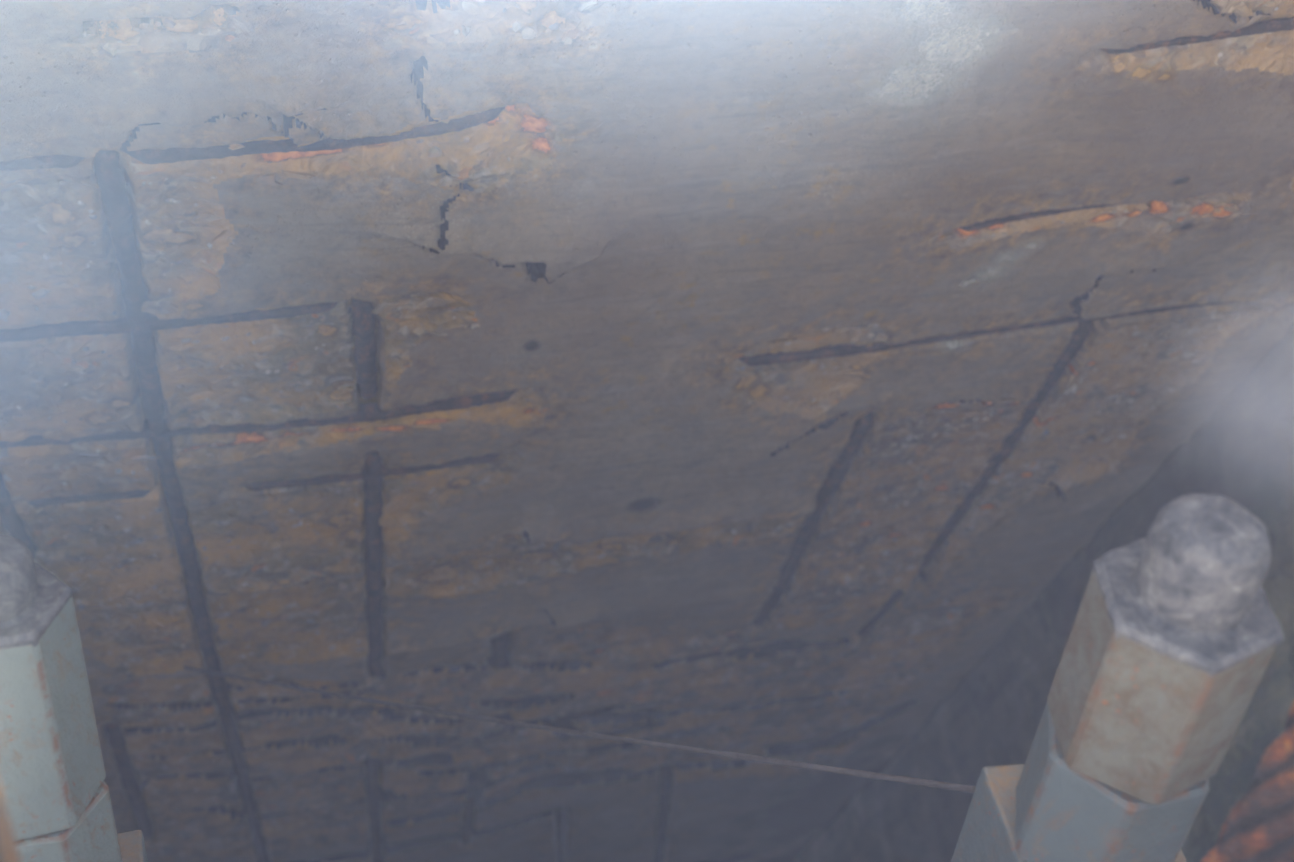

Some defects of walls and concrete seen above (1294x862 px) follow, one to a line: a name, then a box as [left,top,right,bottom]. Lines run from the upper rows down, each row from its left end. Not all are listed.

spalling [1107,0,1294,76]
crack [410,56,438,122]
rust [258,148,344,162]
spalling [130,103,567,194]
crack [419,165,474,254]
spalling [927,191,1253,250]
crack [481,256,565,284]
crack [1070,269,1157,319]
spalling [724,322,890,420]
spalling [0,165,553,680]